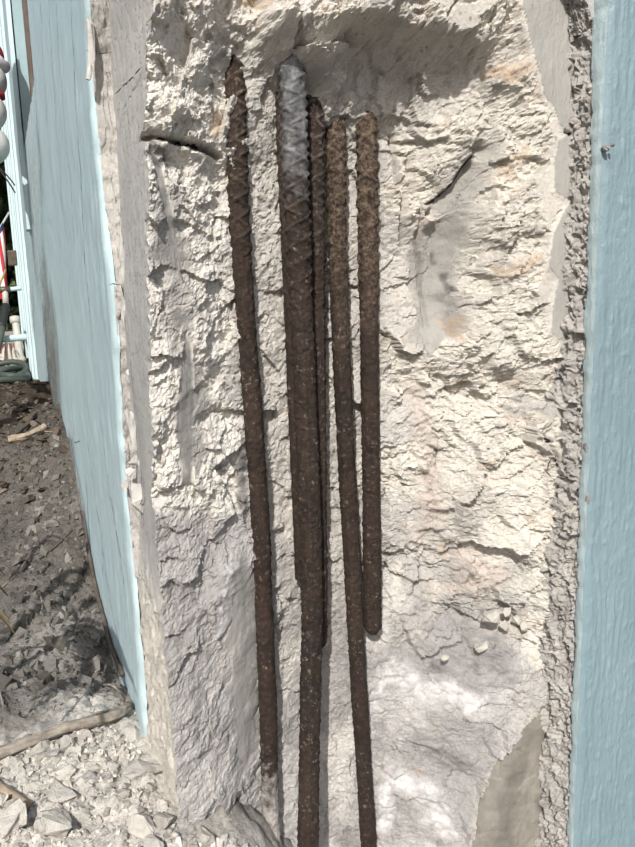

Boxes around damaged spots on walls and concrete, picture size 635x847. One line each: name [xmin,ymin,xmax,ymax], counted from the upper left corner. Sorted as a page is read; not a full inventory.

crack [148,137,207,155]
spalling [86,0,594,847]